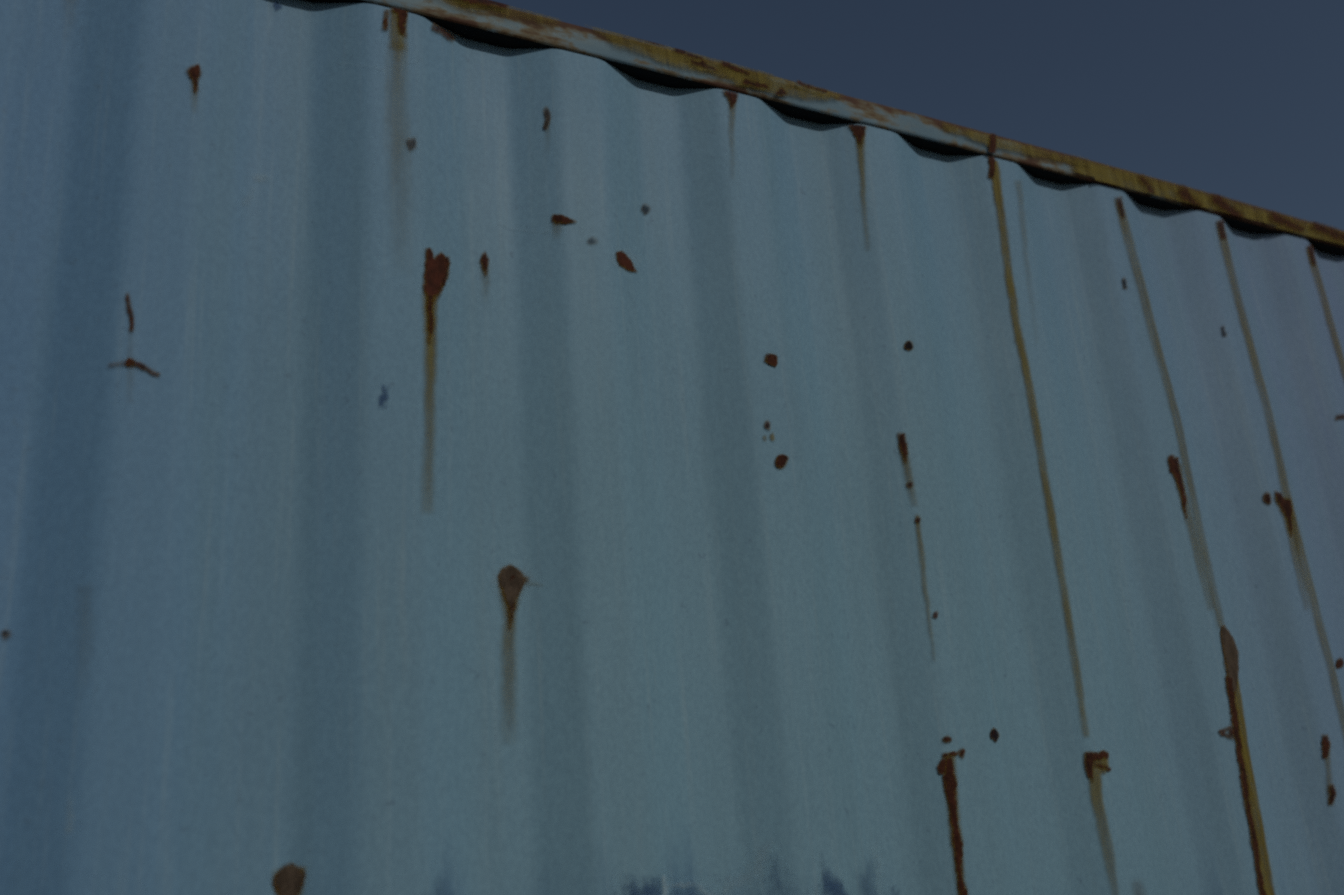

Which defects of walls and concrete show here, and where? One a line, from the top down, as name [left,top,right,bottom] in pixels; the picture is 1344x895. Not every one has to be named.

rust [383,7,408,45]
rust [187,64,201,92]
rust [599,28,839,107]
rust [552,214,576,224]
rust [616,251,637,272]
rust [945,124,1344,447]
rust [422,248,450,402]
rust [498,565,528,629]
rust [938,736,967,895]
rust [1085,750,1111,816]
rust [1219,625,1275,895]
rust [273,863,306,895]